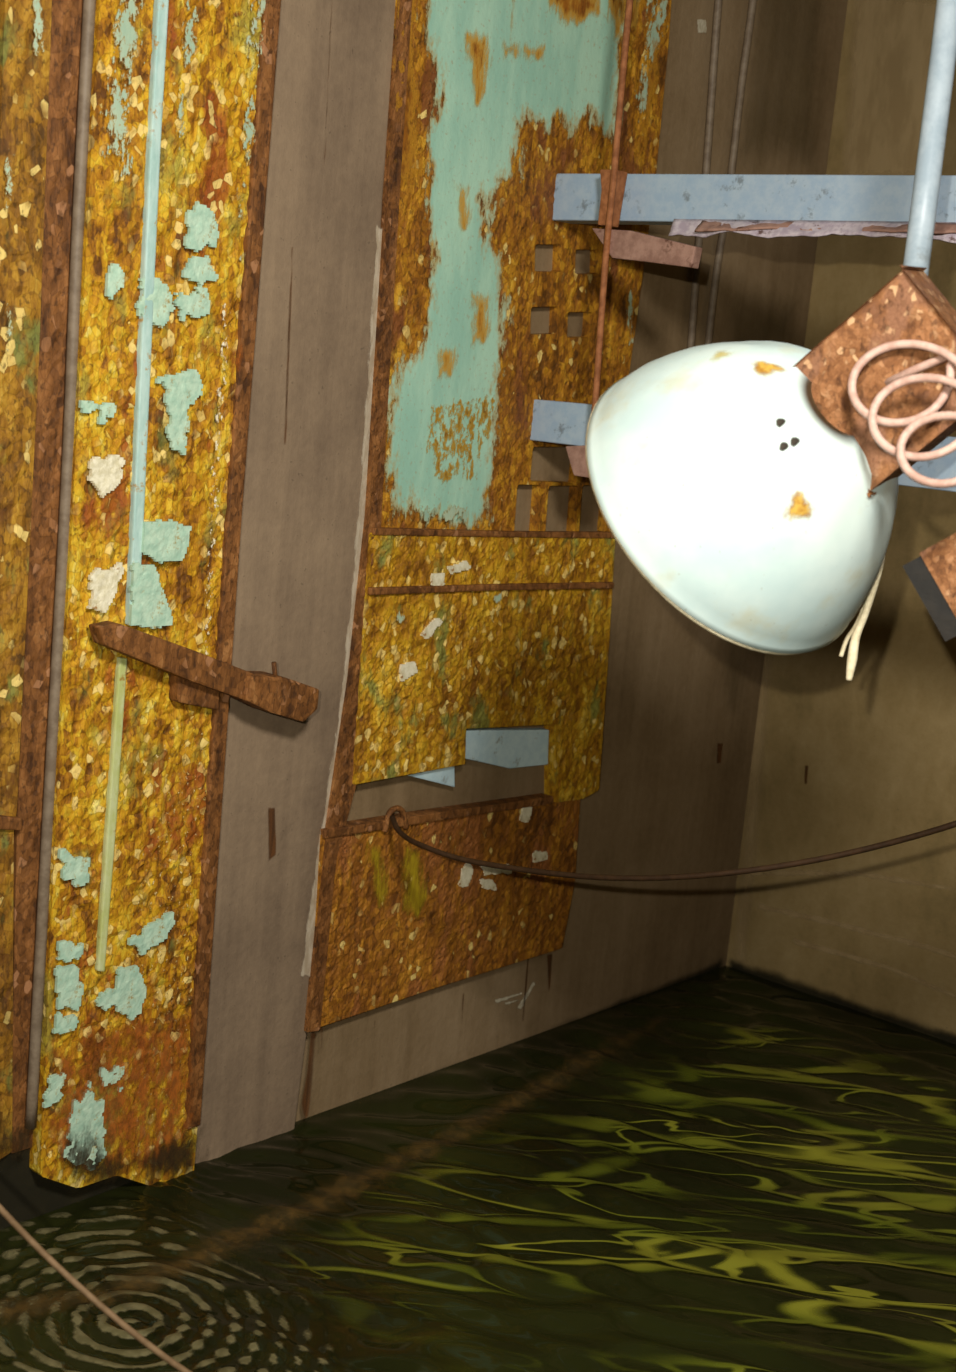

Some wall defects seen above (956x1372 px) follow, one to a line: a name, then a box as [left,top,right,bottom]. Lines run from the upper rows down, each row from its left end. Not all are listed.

corrosion [465,32,545,105]
corrosion [549,0,638,38]
corrosion [459,190,469,230]
peeling [384,0,668,530]
peeling [104,201,228,509]
corrosion [473,296,488,344]
peeling [87,454,125,498]
corrosion [427,398,495,481]
peeling [86,519,192,629]
peeling [52,733,203,1049]
peeling [42,1065,175,1165]
corrosion [51,1017,193,1165]